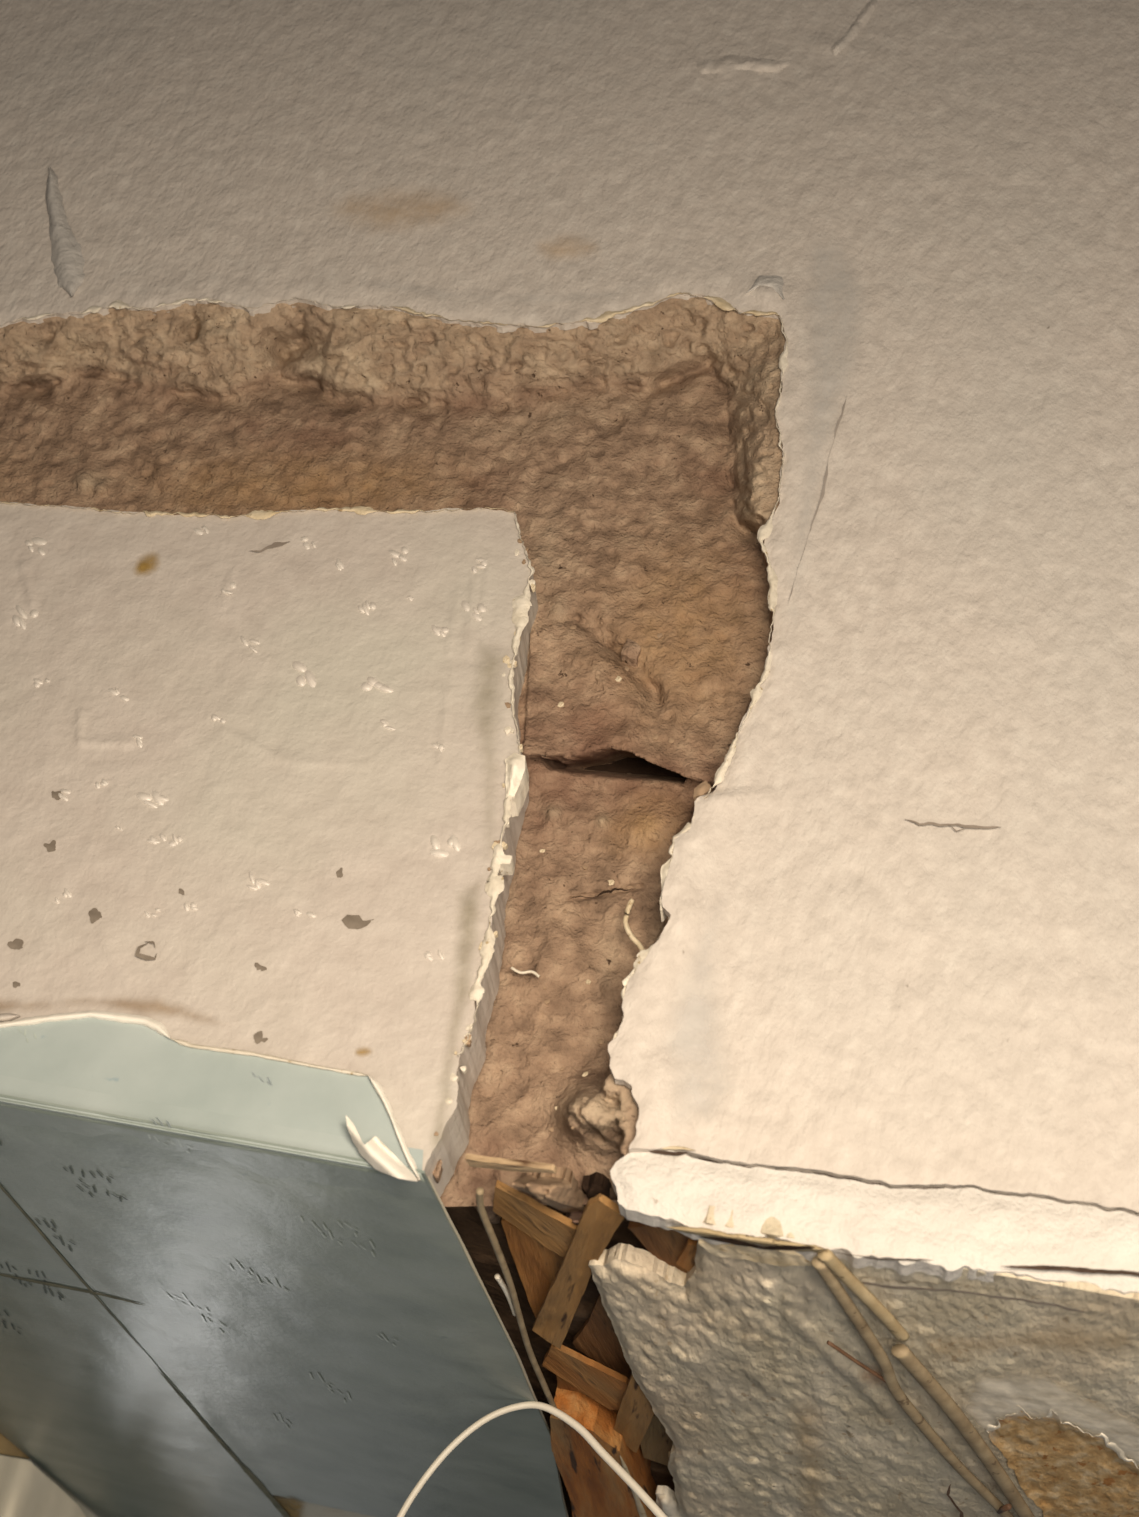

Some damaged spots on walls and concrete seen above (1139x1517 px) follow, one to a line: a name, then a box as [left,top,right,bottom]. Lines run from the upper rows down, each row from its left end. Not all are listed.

spalling [0,292,789,1207]
crack [585,757,686,778]
crack [649,1146,1122,1212]